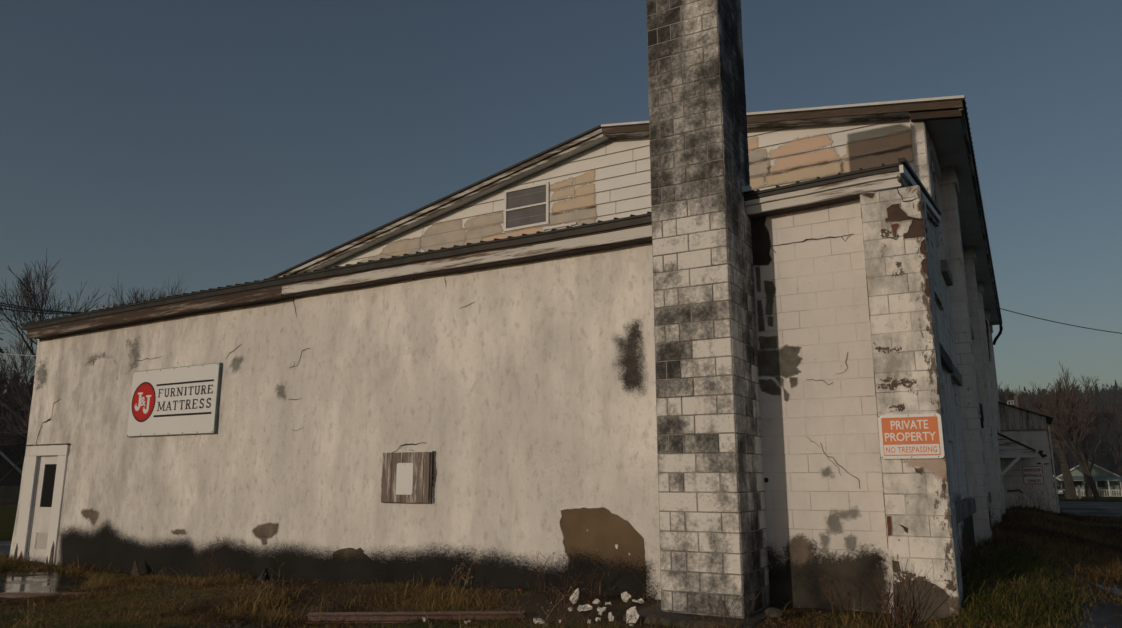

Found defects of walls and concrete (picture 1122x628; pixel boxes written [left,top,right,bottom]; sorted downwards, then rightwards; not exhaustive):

crack [771,234,853,253]
spalling [880,192,936,309]
peeling [751,217,803,401]
mould [616,322,644,392]
crack [805,436,860,488]
damp [57,520,655,600]
spalling [558,505,649,597]
damp [767,510,891,613]
spalling [891,560,954,622]